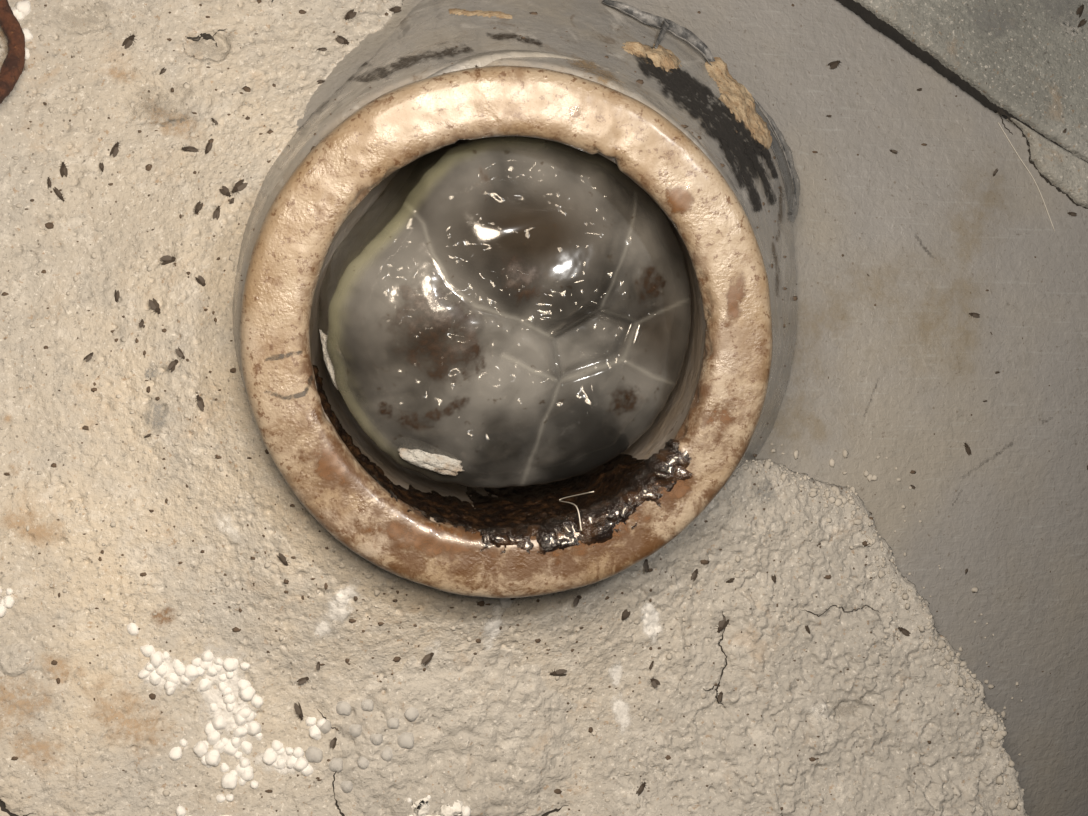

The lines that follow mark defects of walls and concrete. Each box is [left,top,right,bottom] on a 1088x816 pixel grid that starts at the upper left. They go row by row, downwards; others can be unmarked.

damp [721,139,778,205]
crack [996,108,1088,209]
corrosion [313,432,352,486]
corrosion [657,468,692,502]
corrosion [362,516,498,560]
corrosion [552,513,652,565]
crack [332,772,345,816]
crack [541,805,569,816]